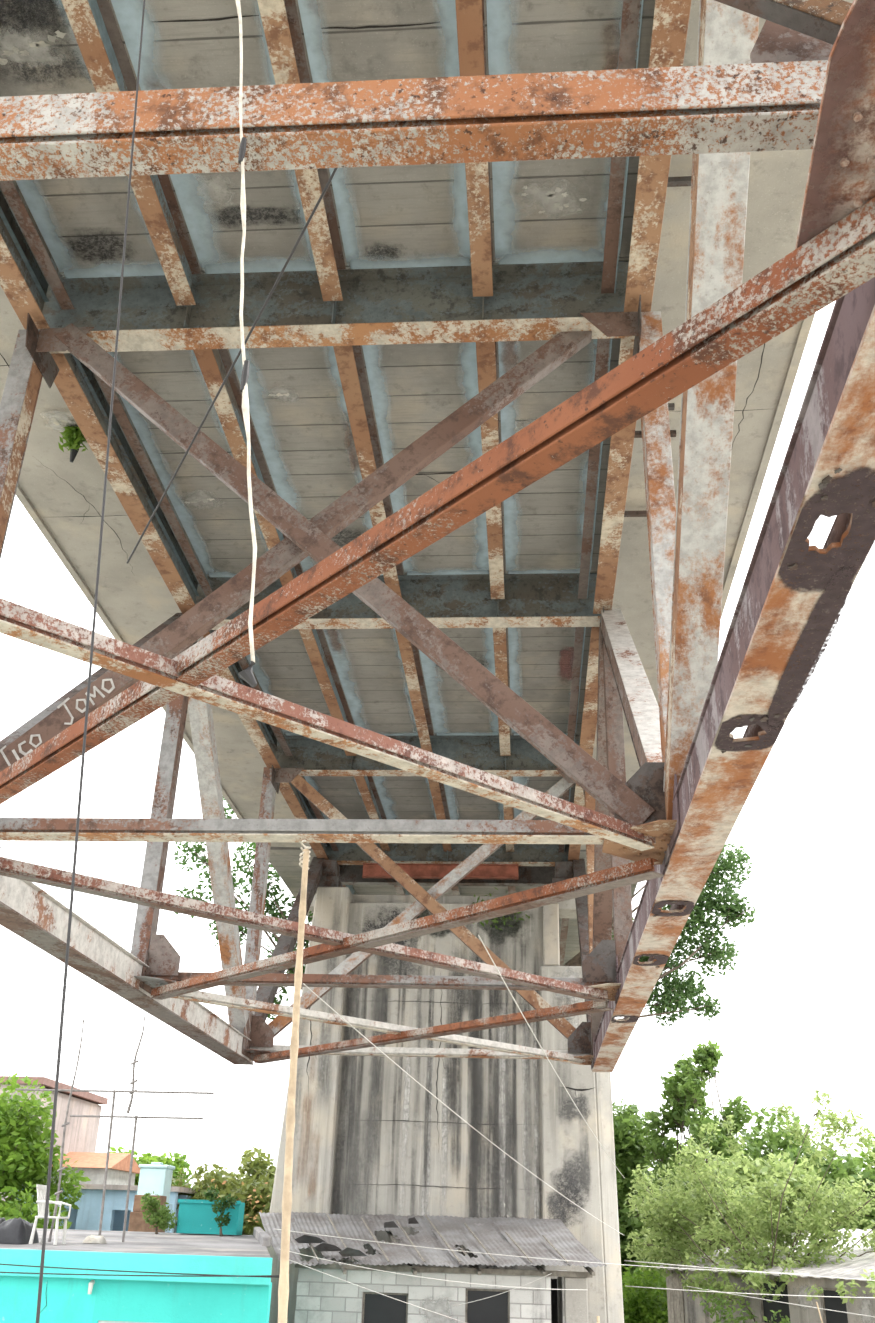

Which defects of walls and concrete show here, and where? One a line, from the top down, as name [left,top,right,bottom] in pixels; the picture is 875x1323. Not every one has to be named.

water stain [0,0,89,83]
water stain [67,231,129,262]
water stain [319,960,411,1215]
water stain [412,972,589,1222]